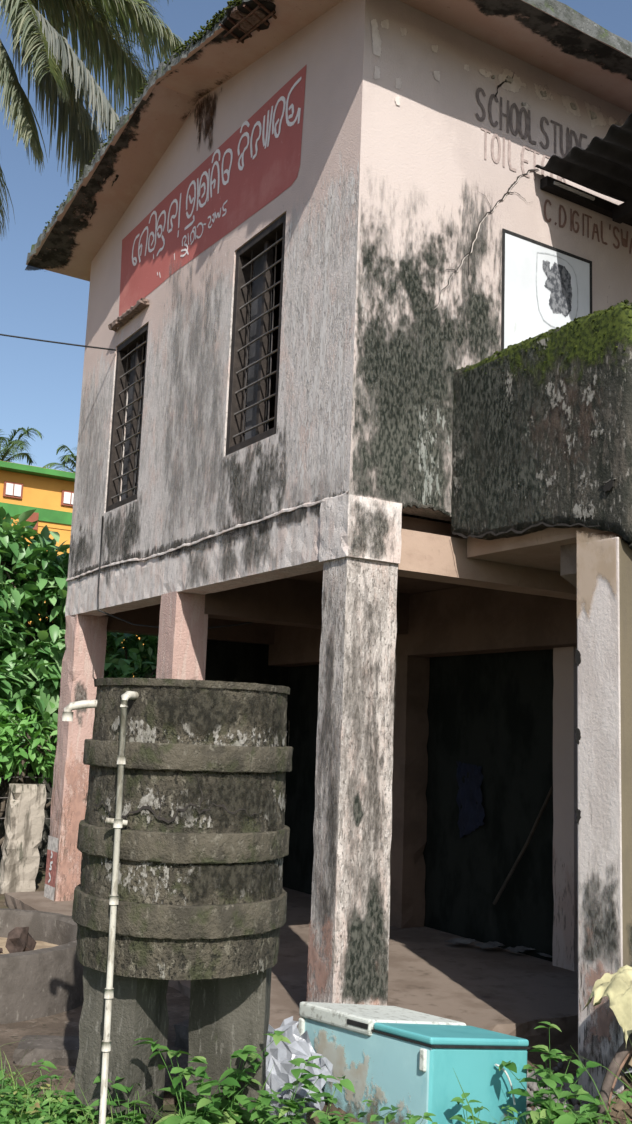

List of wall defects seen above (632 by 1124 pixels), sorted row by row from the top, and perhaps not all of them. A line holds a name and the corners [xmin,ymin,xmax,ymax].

spalling [219,0,277,44]
leakage [25,30,232,271]
crack [430,169,539,311]
leakage [350,185,551,557]
peeling [523,374,604,455]
leakage [69,501,157,584]
leakage [188,430,286,582]
peeling [536,469,559,506]
peeling [573,470,616,520]
leakage [313,630,388,1003]
leakage [184,859,276,901]
leakage [584,879,632,967]